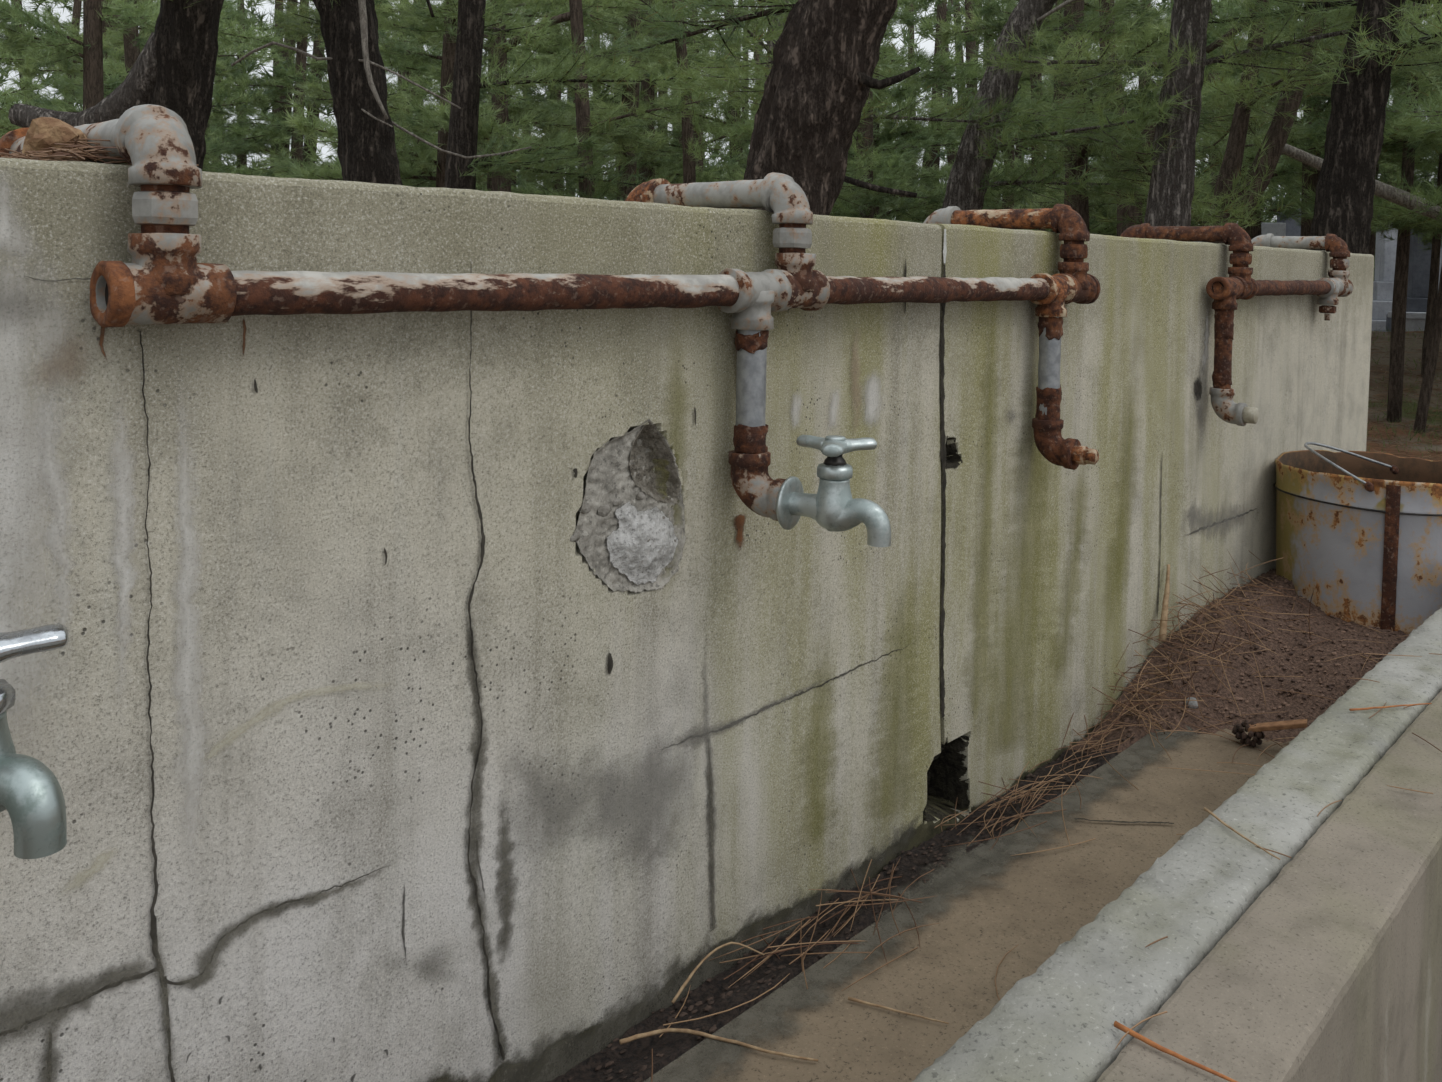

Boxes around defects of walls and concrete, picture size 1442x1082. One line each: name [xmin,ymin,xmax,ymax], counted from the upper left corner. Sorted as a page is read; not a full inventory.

water stain [0,186,25,248]
water stain [0,653,36,699]
water stain [0,278,70,633]
water stain [113,436,135,649]
crack [92,331,198,1014]
water stain [176,457,203,824]
crack [467,311,505,1060]
spalling [570,419,686,593]
rust [735,514,745,547]
crack [667,648,904,748]
crack [939,263,947,718]
crack [239,867,406,957]